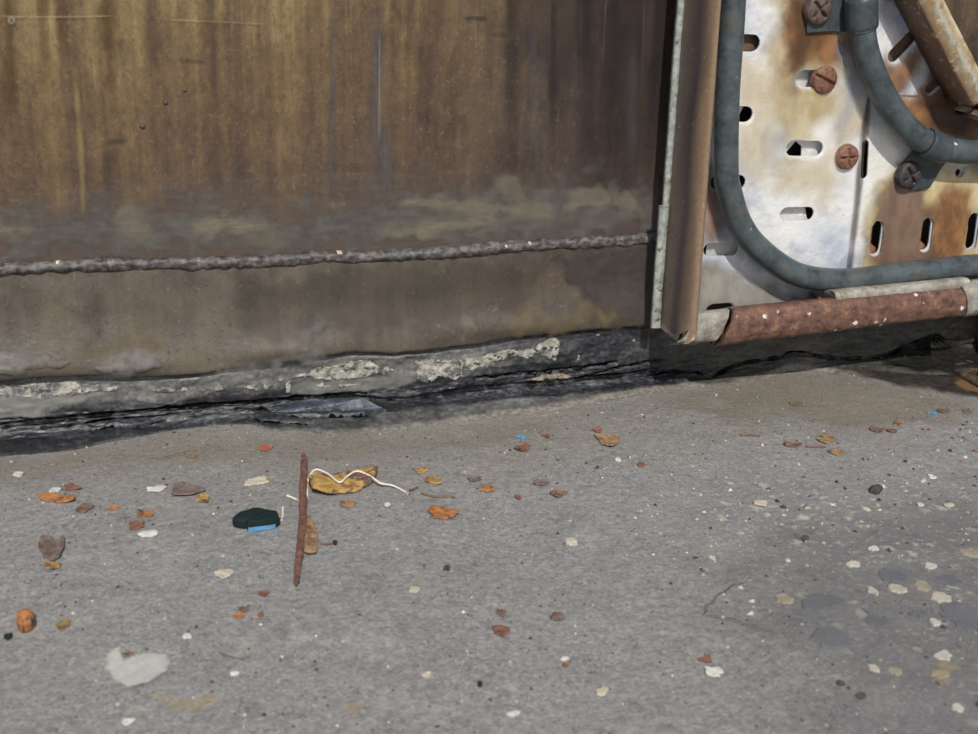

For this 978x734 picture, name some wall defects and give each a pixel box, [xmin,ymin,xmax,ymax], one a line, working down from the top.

rust [770,0,850,141]
rust [886,48,978,139]
damp [0,184,657,264]
rust [707,176,719,239]
rust [864,165,978,267]
peeling [0,381,117,400]
peeling [244,360,393,393]
peeling [414,337,560,383]
spalling [531,373,571,382]